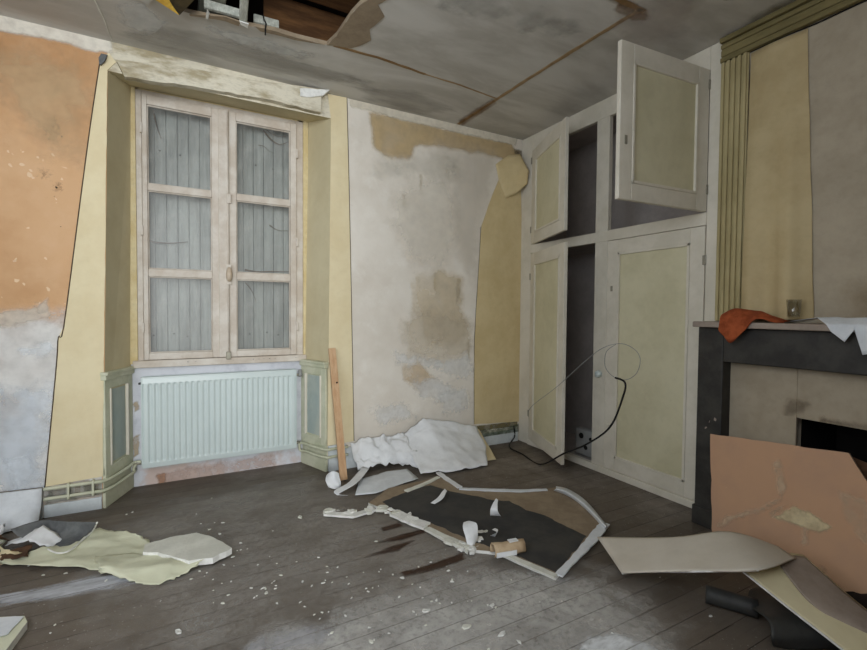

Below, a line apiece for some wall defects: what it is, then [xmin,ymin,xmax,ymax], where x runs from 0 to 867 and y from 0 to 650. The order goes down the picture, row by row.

peeling [189,10,325,45]
peeling [349,99,517,145]